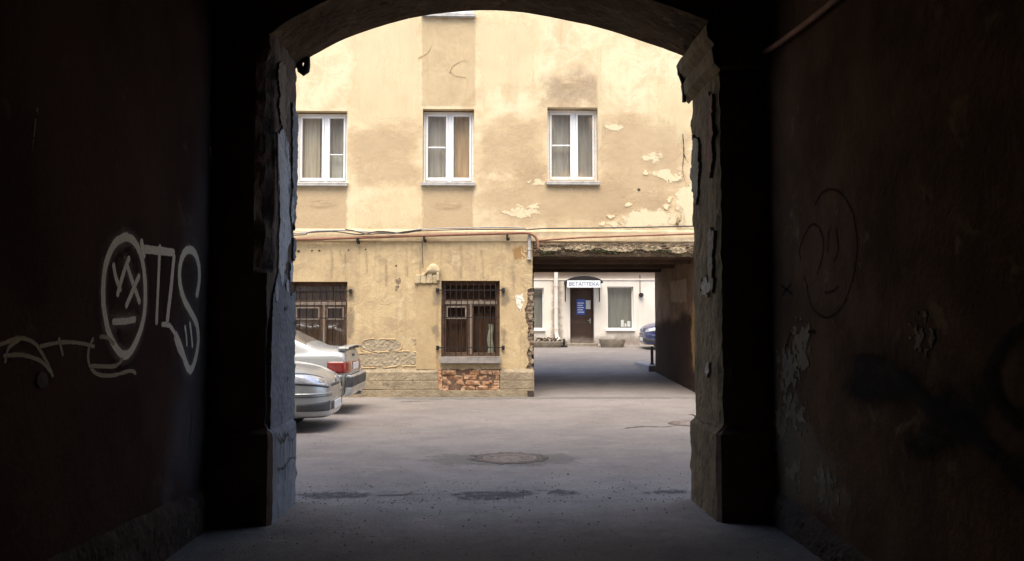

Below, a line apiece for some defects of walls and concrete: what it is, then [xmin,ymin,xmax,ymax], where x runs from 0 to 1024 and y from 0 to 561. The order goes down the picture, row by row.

peeling [501,203,541,219]
peeling [599,92,718,230]
spalling [515,242,687,369]
flaking render [437,363,502,391]
flaking render [772,316,811,452]